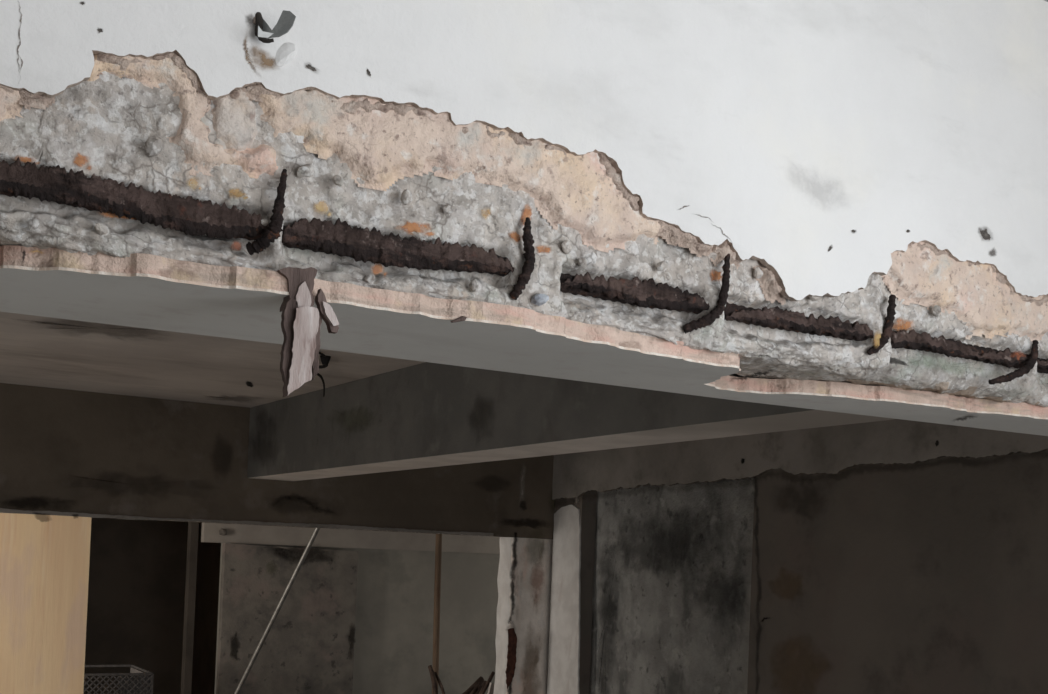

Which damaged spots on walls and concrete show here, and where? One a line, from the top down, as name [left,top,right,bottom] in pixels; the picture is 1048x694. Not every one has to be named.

crack [16,9,24,67]
rust [74,153,91,170]
rust [402,222,434,236]
rust [509,207,532,242]
spalling [0,52,1048,407]
crack [508,532,517,624]